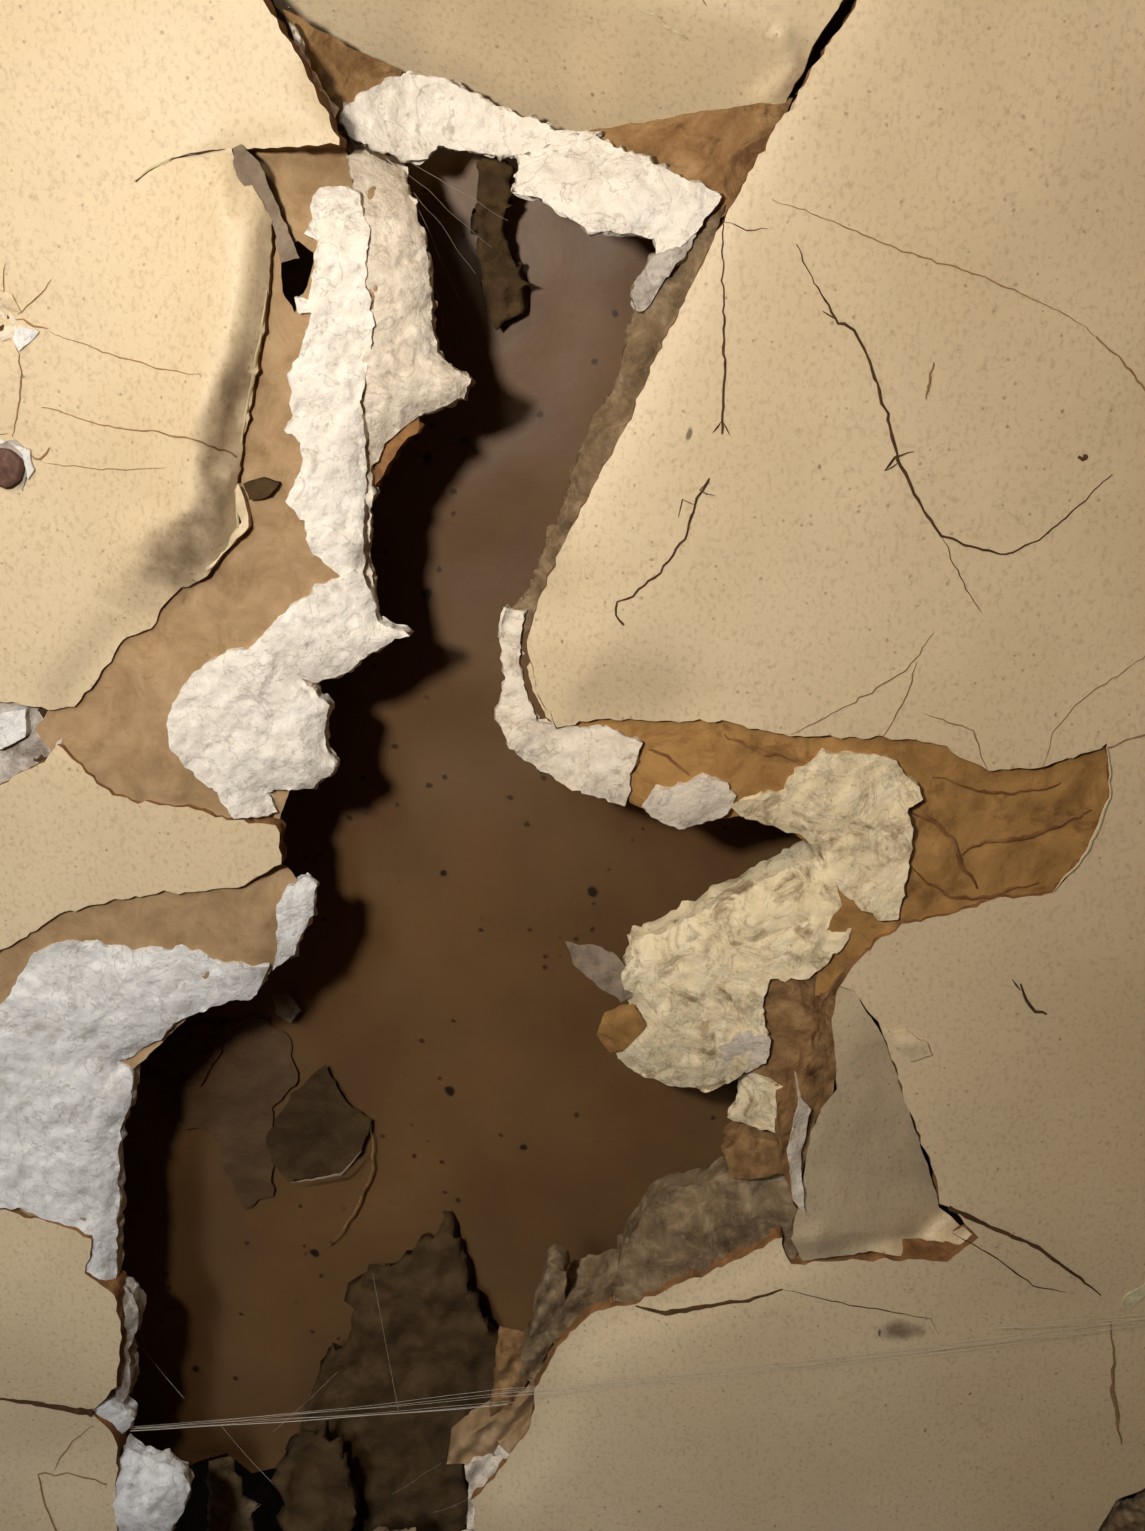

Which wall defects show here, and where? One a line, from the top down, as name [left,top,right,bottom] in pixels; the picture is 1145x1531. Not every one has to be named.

crack [713,199,1145,613]
crack [615,478,715,626]
spalling [0,0,854,1531]
spalling [494,605,1112,996]
crack [790,633,988,770]
crack [1044,656,1145,762]
spalling [842,987,894,1065]
spalling [906,1105,965,1225]